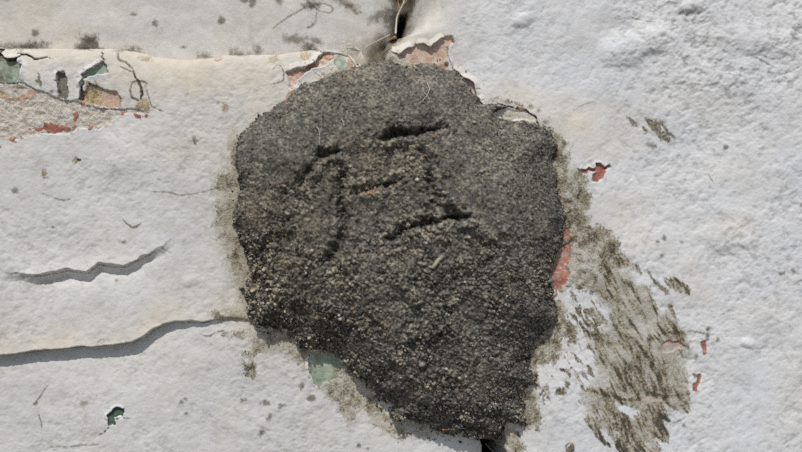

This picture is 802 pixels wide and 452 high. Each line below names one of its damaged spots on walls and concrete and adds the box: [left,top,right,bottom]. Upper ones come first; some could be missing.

crack [396,26,404,39]
peeling [0,48,150,147]
peeling [285,51,354,100]
peeling [391,32,487,105]
peeling [578,159,611,182]
peeling [551,228,571,299]
water stain [492,127,705,452]
peeling [101,403,125,434]